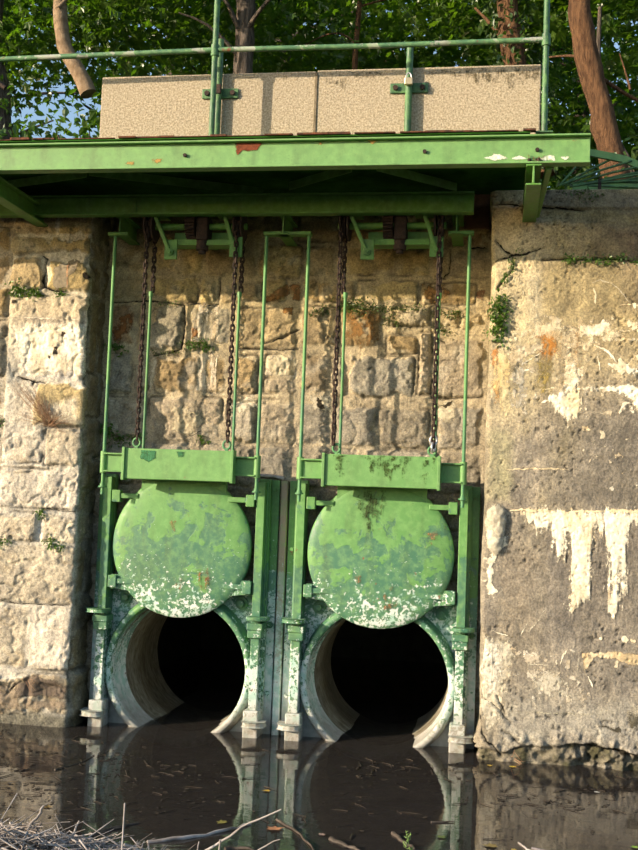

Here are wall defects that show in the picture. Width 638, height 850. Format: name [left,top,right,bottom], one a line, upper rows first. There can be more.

rust [0,128,536,155]
crack [471,242,633,288]
rust [537,332,562,394]
water stain [540,331,638,428]
water stain [481,536,508,598]
water stain [510,507,638,619]
spalling [479,632,638,733]